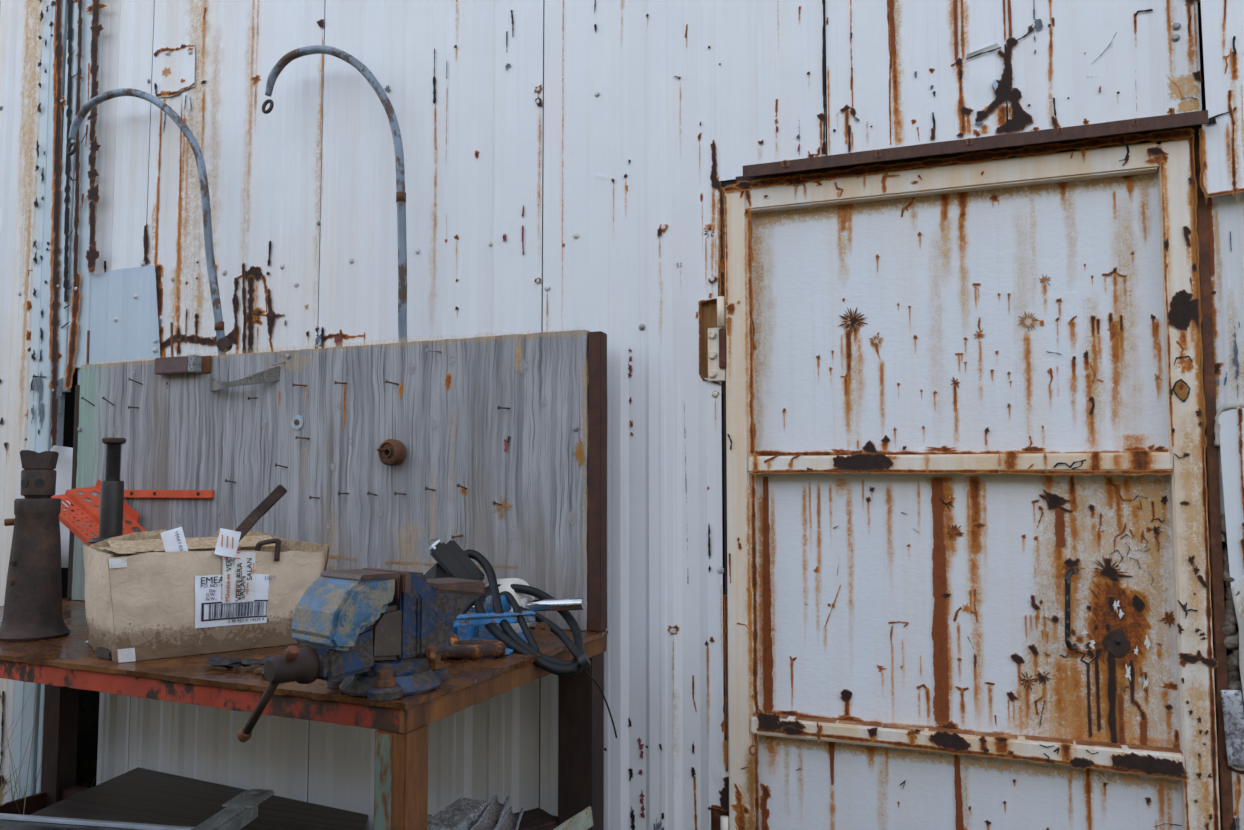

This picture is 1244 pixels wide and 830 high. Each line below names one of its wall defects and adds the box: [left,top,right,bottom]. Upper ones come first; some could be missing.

corrosion [249,0,260,140]
corrosion [20,215,33,419]
corrosion [49,0,106,449]
corrosion [152,98,166,267]
corrosion [172,80,206,351]
corrosion [232,263,286,354]
corrosion [700,0,1244,830]